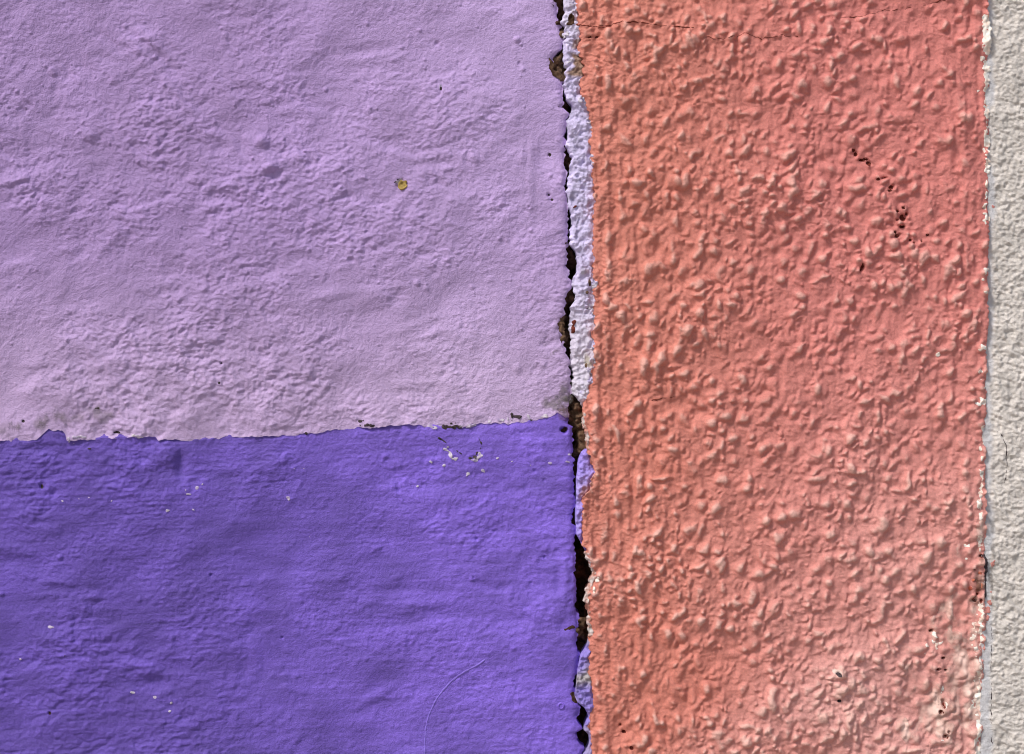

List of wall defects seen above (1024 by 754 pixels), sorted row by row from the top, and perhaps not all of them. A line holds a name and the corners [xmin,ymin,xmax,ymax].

spalling [560,0,598,407]
crack [549,0,798,651]
peeling [415,412,548,476]
spalling [575,449,595,551]
peeling [964,425,988,754]
crack [570,679,588,748]
spalling [574,639,594,754]